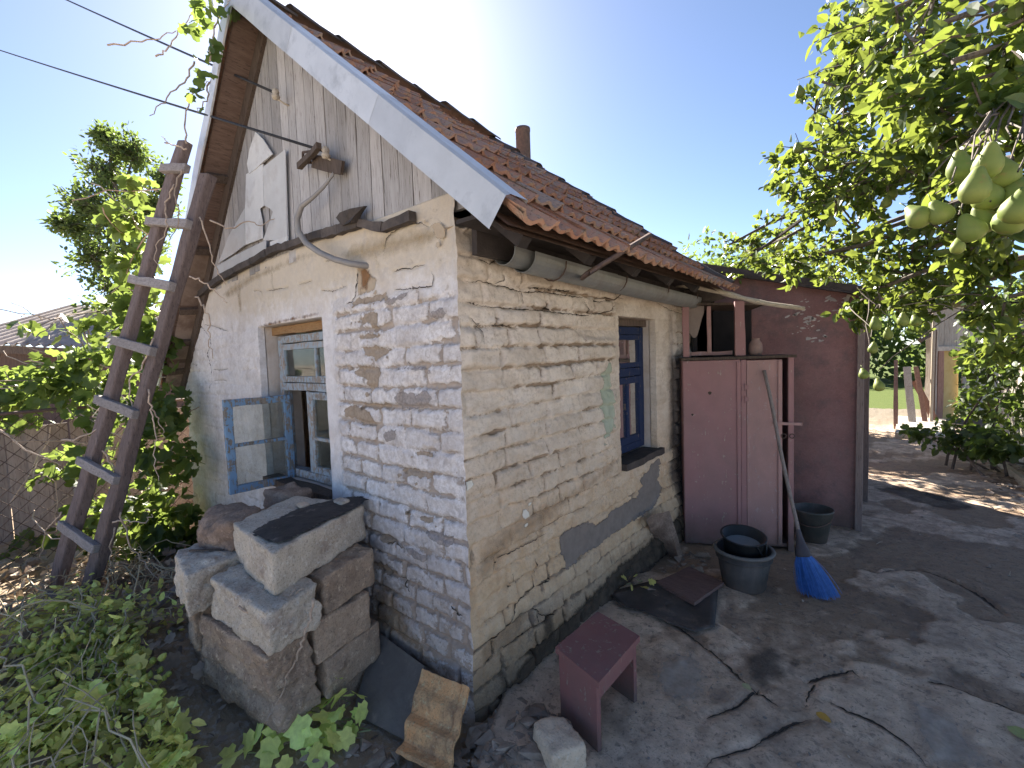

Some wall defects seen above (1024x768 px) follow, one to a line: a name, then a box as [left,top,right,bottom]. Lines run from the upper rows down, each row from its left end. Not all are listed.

spalling [340,267,431,442]
spalling [430,308,446,319]
peeling [785,299,827,342]
peeling [599,363,617,445]
spalling [397,451,435,486]
spalling [375,530,427,562]
spalling [405,510,454,547]
spalling [559,459,662,569]
damp [498,538,668,698]
crack [680,628,926,768]